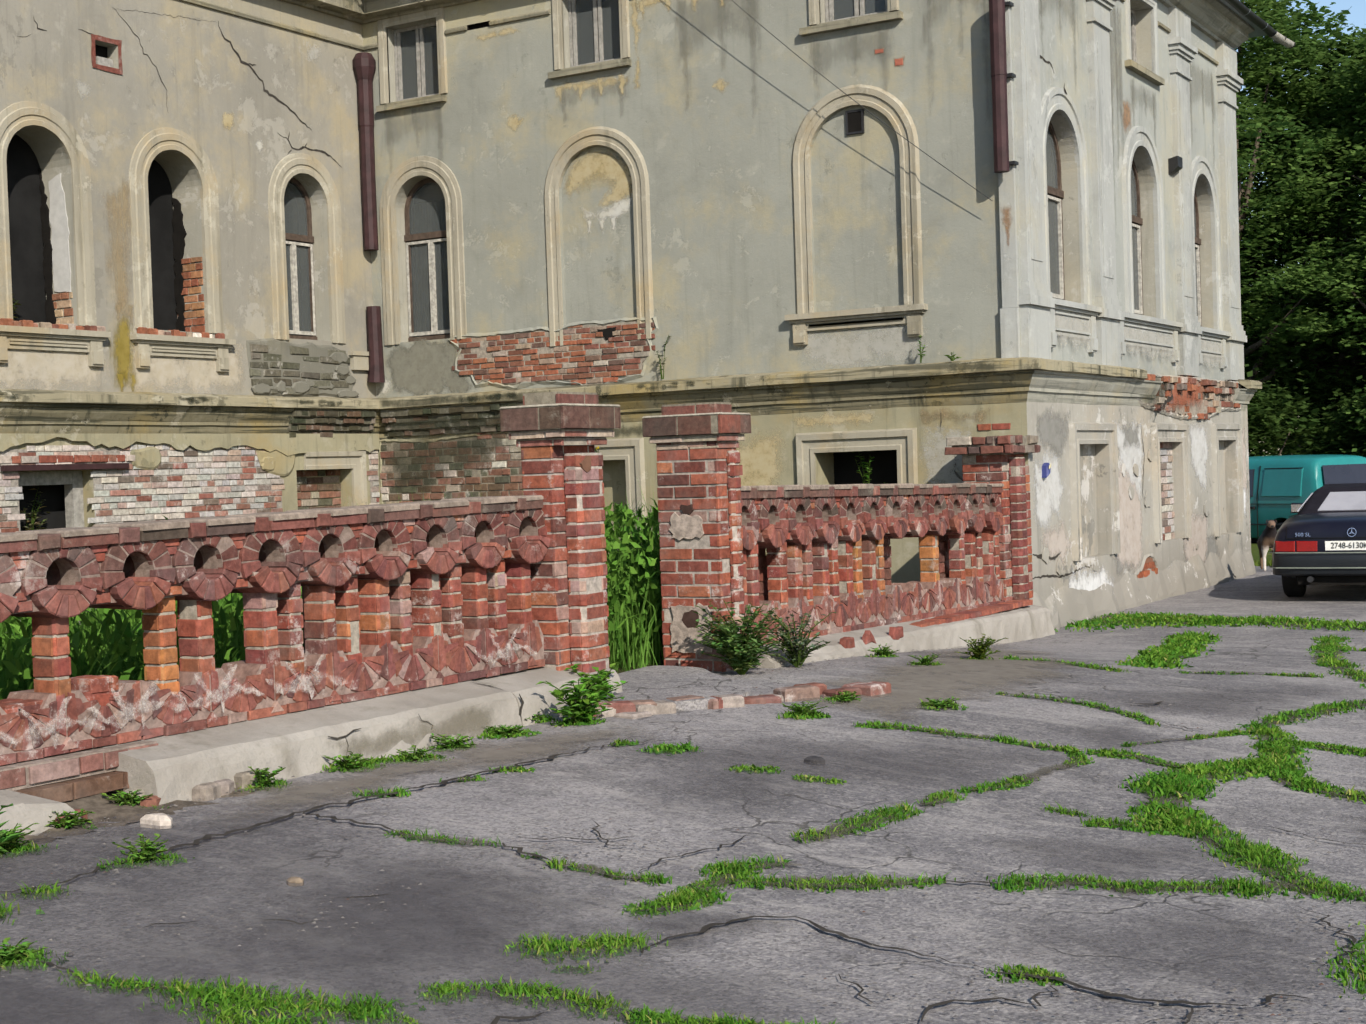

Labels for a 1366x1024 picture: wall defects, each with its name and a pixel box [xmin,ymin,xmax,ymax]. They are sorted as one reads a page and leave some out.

crack [18,9,340,166]
peeling [567,154,632,232]
leakage [108,185,136,391]
peeling [1124,328,1174,355]
spalling [0,316,659,533]
spalling [1034,341,1241,591]
crack [328,728,361,756]
crack [473,682,524,723]